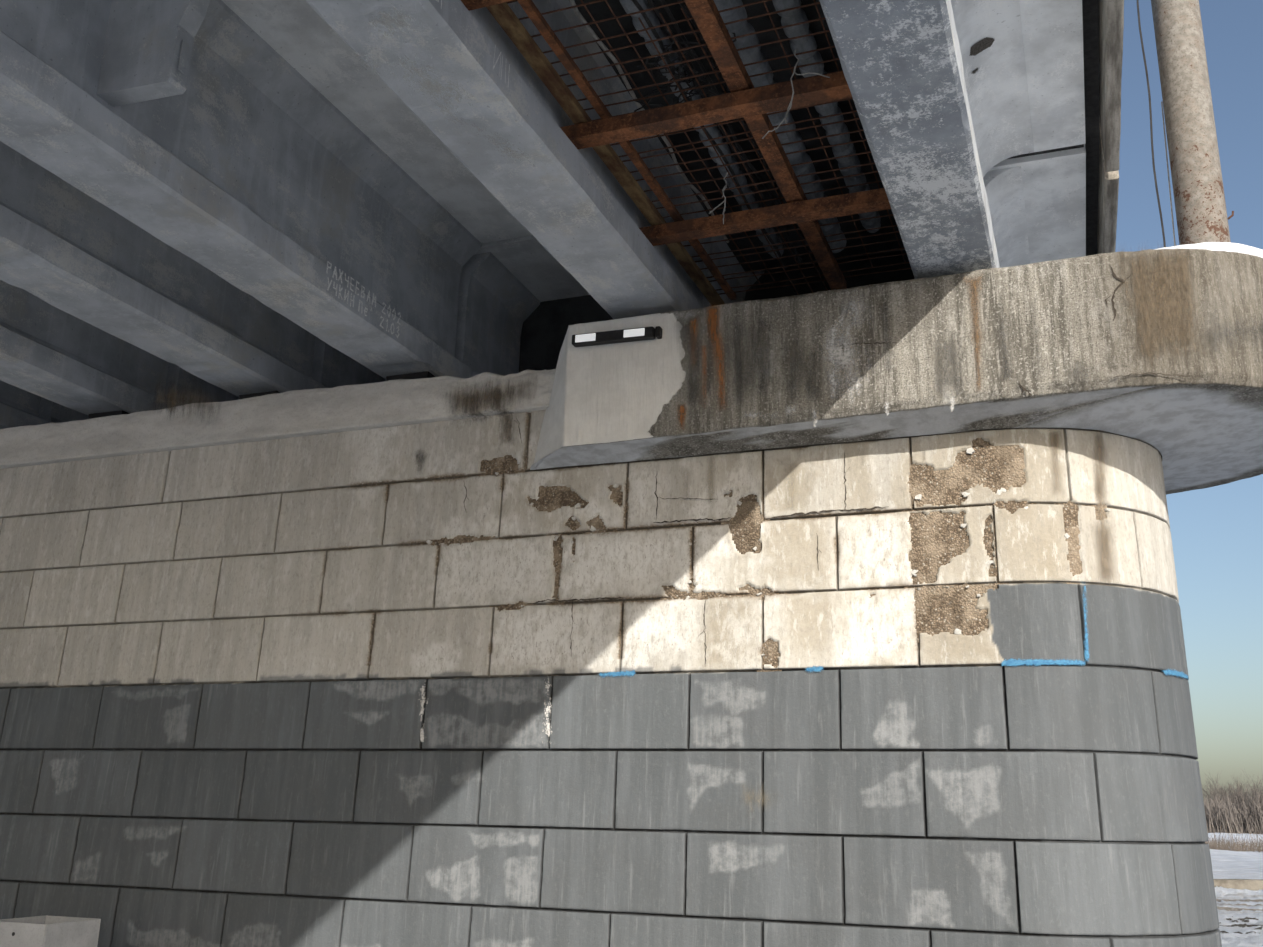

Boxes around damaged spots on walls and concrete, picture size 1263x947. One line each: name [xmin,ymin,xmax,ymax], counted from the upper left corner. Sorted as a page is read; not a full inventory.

crack [1105,267,1131,321]
rust [691,306,724,406]
water stain [450,385,523,442]
spalling [489,486,618,612]
spalling [608,477,629,512]
spalling [721,489,770,554]
spalling [901,430,1036,642]